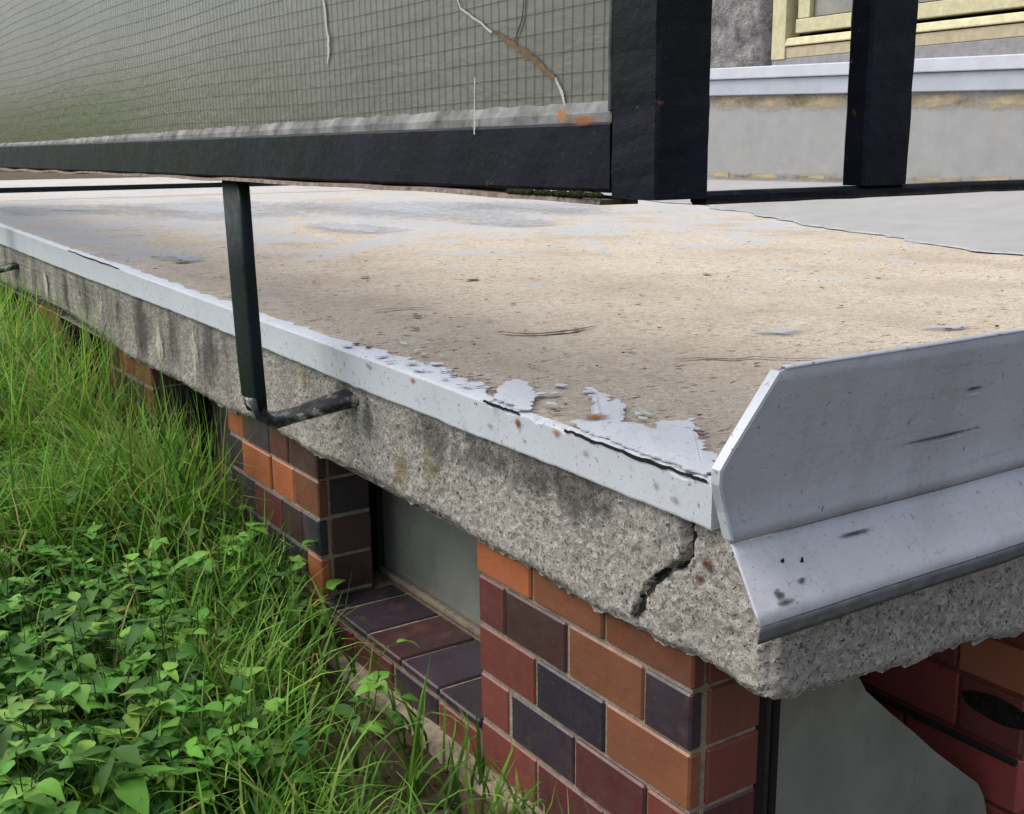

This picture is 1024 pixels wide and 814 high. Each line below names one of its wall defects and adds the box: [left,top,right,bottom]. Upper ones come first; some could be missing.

crack [457,0,566,105]
corrosion [556,109,592,125]
peeling [570,387,718,476]
crack [634,522,698,617]